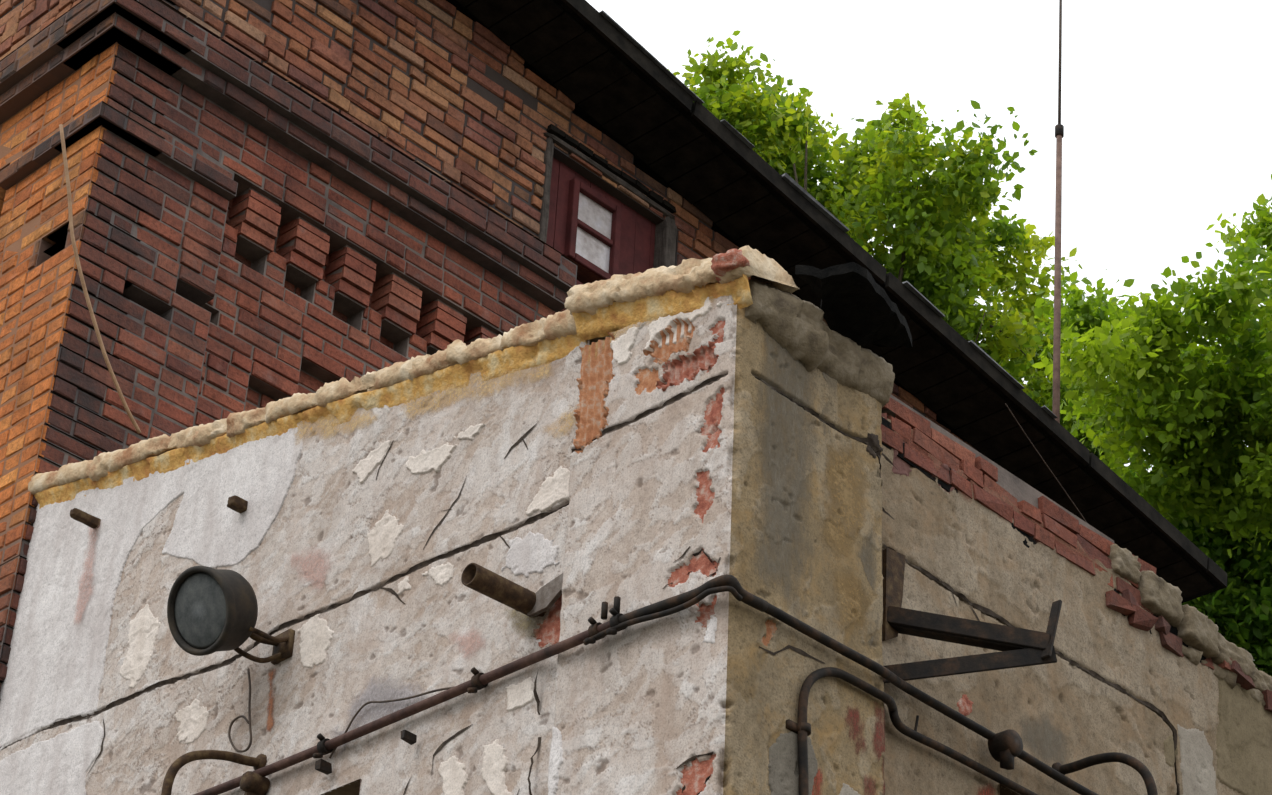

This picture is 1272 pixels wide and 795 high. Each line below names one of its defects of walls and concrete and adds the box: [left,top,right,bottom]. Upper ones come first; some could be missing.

spalling [711,249,751,283]
spalling [573,297,725,454]
peeling [525,466,570,516]
crack [570,374,1015,627]
spalling [663,546,719,589]
peeling [0,421,304,795]
crack [0,476,569,773]
peeling [297,613,334,668]
crack [759,645,825,664]
spalling [1106,589,1184,658]
crack [1055,651,1180,795]
spalling [676,752,716,795]